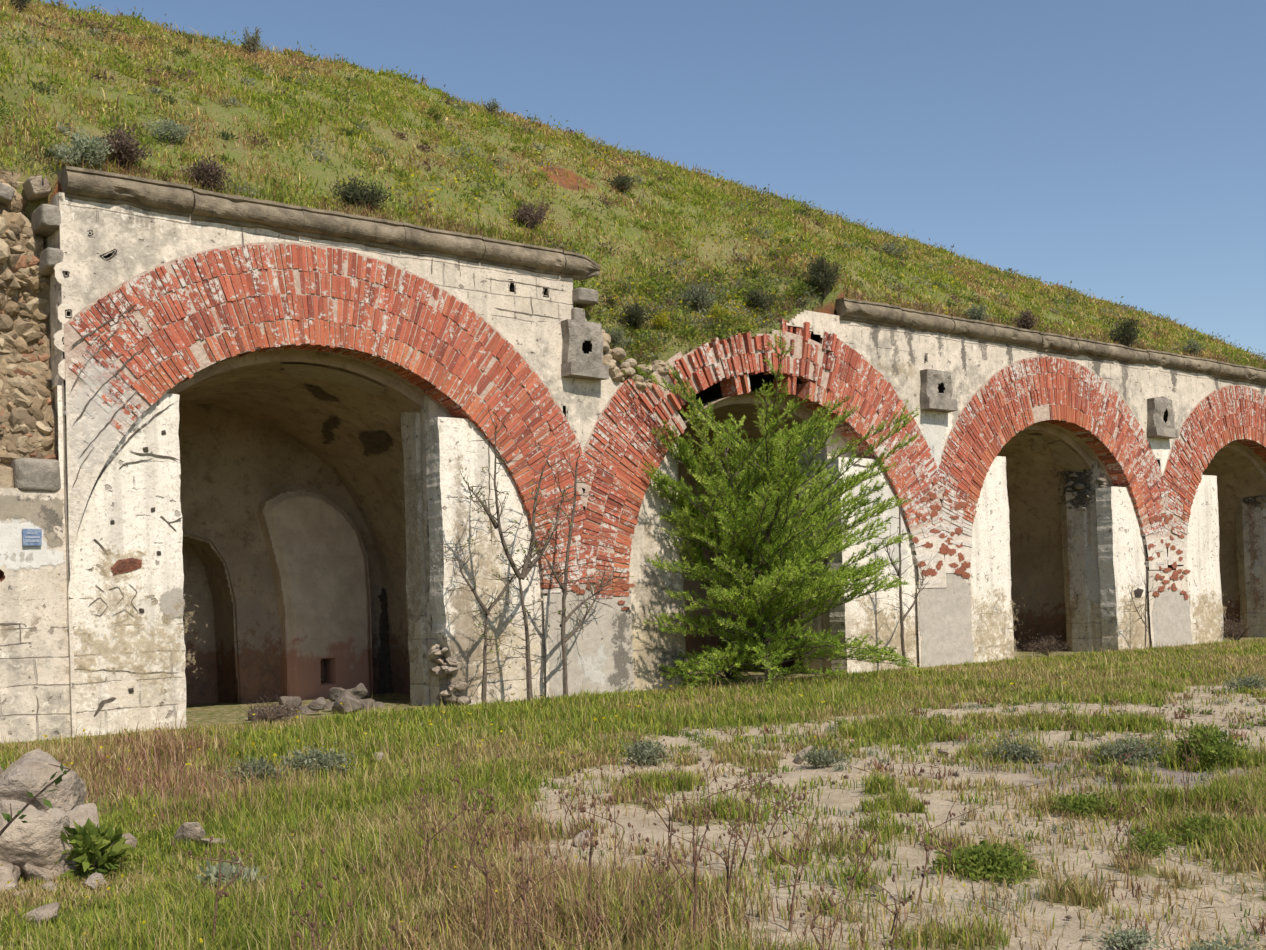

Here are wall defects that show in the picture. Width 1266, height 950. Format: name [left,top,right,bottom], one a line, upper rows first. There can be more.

flaking render [0,495,64,547]
spalling [111,558,142,575]